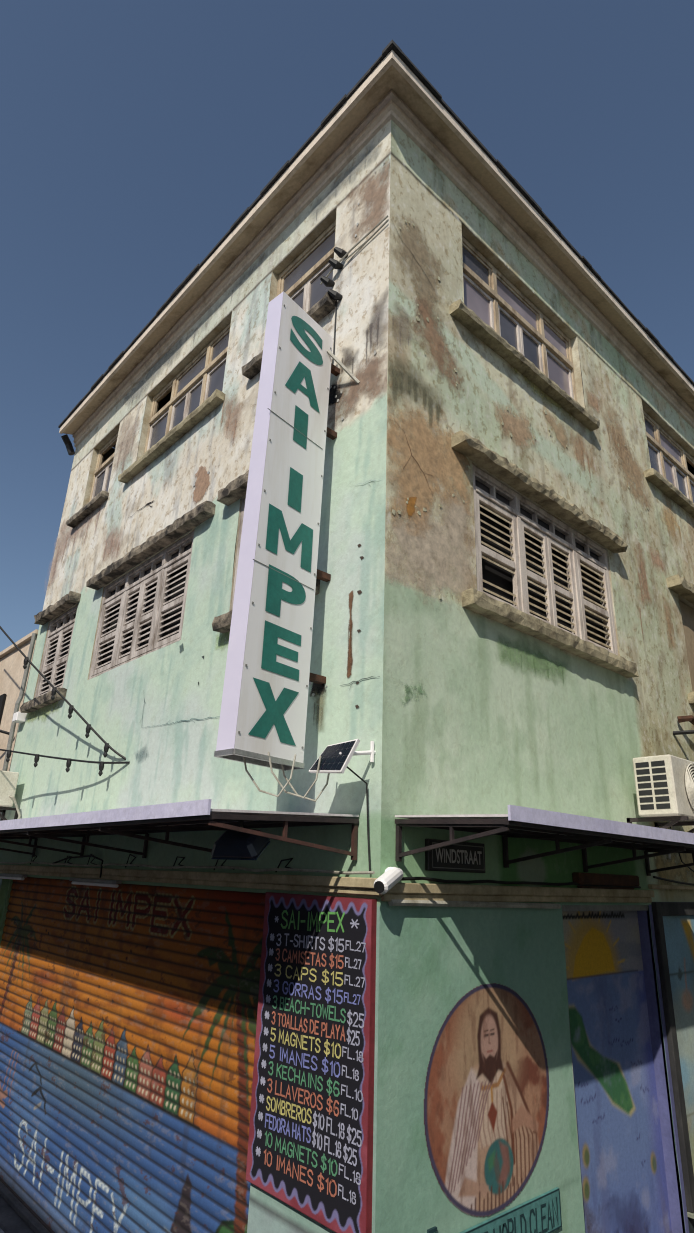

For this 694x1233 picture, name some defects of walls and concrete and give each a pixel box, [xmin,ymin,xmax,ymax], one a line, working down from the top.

peeling [348,161,390,237]
peeling [397,220,460,387]